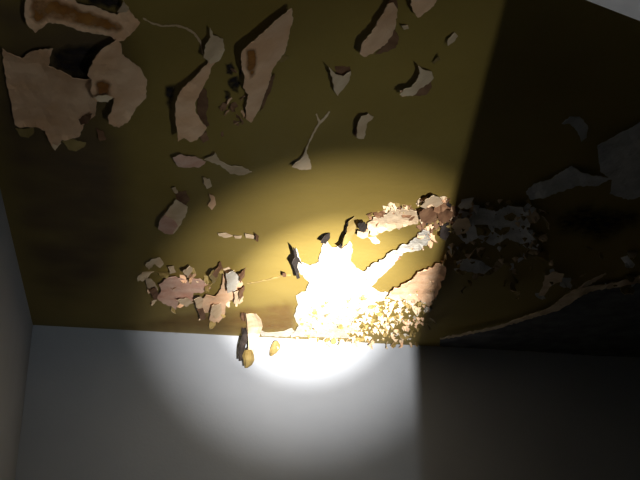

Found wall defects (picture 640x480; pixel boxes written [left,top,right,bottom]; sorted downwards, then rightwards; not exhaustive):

peeling [360,0,409,57]
peeling [410,0,437,18]
peeling [2,0,147,151]
peeling [175,28,225,143]
peeling [219,8,293,126]
peeling [400,56,441,97]
crack [306,111,330,151]
peeling [354,113,373,139]
peeling [173,153,252,175]
peeling [158,187,190,234]
flaking render [238,122,640,368]
peeling [137,257,246,329]